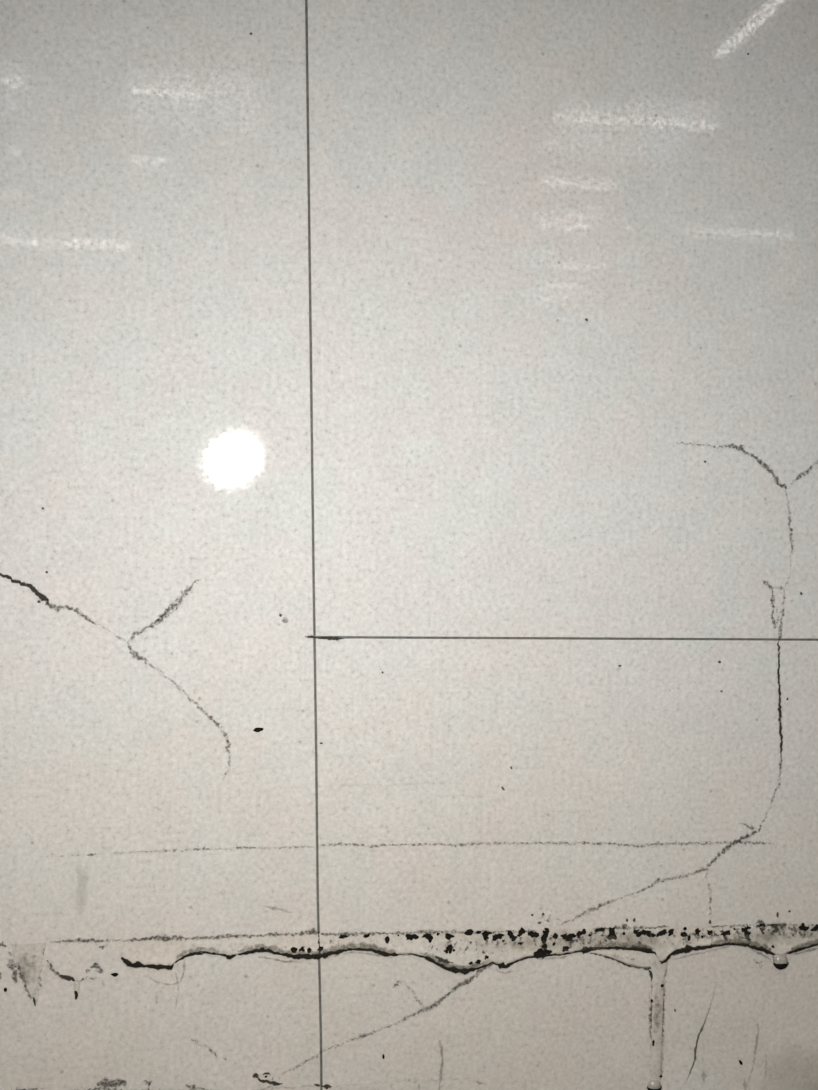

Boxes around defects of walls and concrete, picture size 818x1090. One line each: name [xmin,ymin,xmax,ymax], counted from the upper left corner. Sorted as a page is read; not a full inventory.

crack [682,442,817,550]
crack [0,573,94,623]
crack [128,586,231,775]
crack [322,581,785,925]
damp [647,961,668,1090]